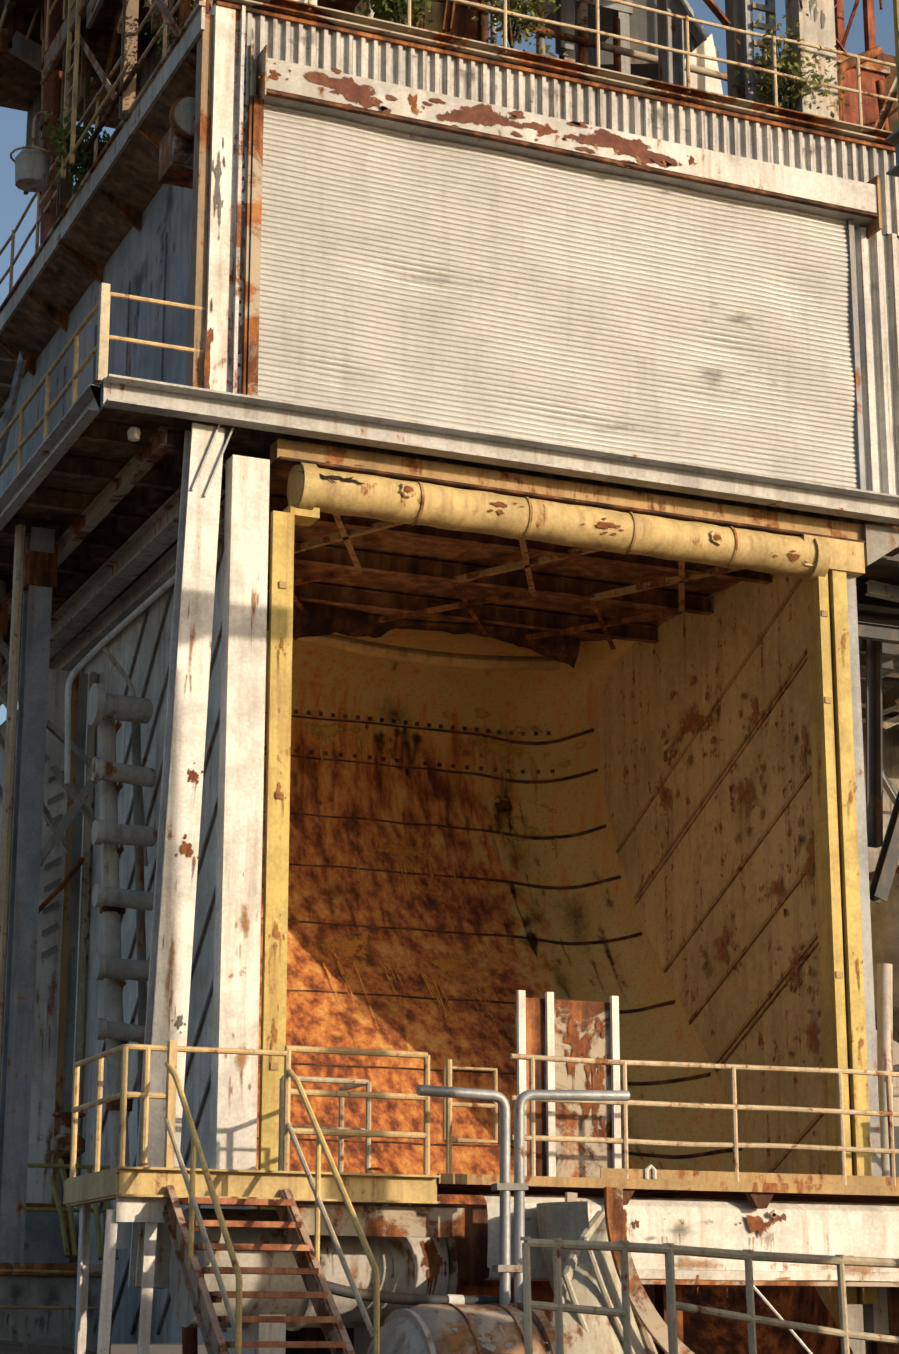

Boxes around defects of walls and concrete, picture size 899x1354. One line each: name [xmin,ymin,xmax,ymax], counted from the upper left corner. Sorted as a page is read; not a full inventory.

rust [489,501,524,515]
rust [582,518,624,535]
rust [649,676,720,850]
rust [729,693,767,845]
rust [758,815,815,917]
rust [503,944,642,1178]